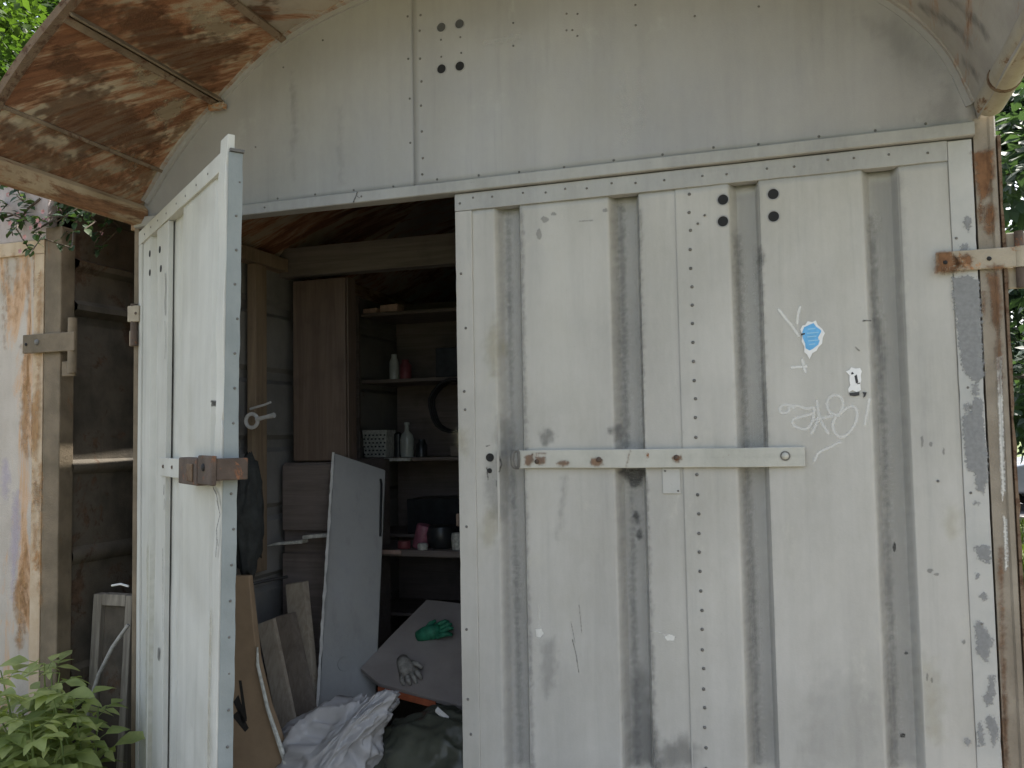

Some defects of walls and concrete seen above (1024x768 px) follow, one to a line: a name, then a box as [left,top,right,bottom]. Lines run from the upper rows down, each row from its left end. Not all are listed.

corrosion [74,0,248,91]
corrosion [0,46,166,164]
corrosion [974,150,995,234]
corrosion [935,252,972,273]
corrosion [21,366,40,453]
peeling [951,276,1006,505]
corrosion [525,454,545,465]
peeling [975,621,994,662]
peeling [965,675,999,747]